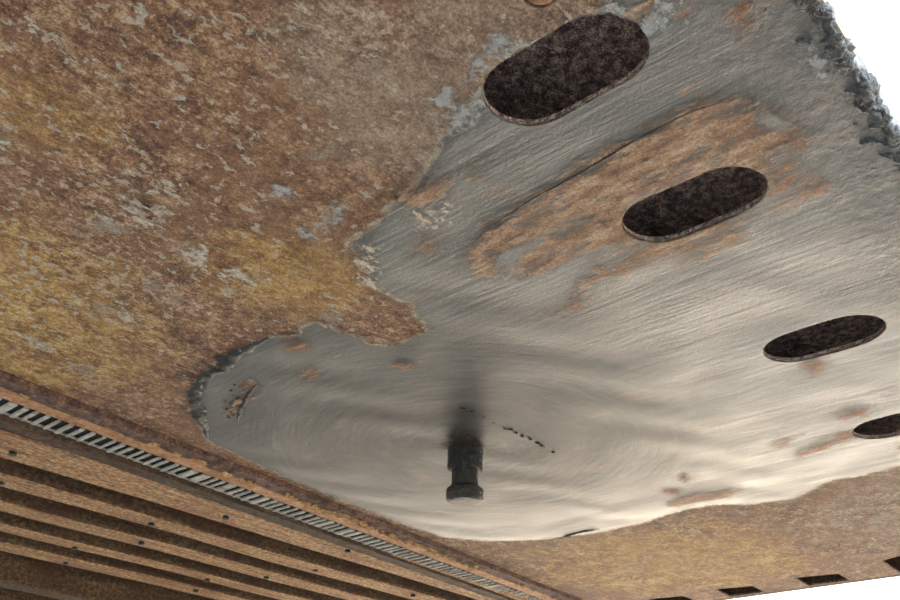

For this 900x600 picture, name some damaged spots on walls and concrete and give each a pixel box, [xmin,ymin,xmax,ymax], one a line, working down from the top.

leakage [755,103,791,133]
rust [396,160,487,210]
rust [458,94,839,316]
rust [789,407,870,459]
rust [660,475,742,507]
rust [285,492,485,572]